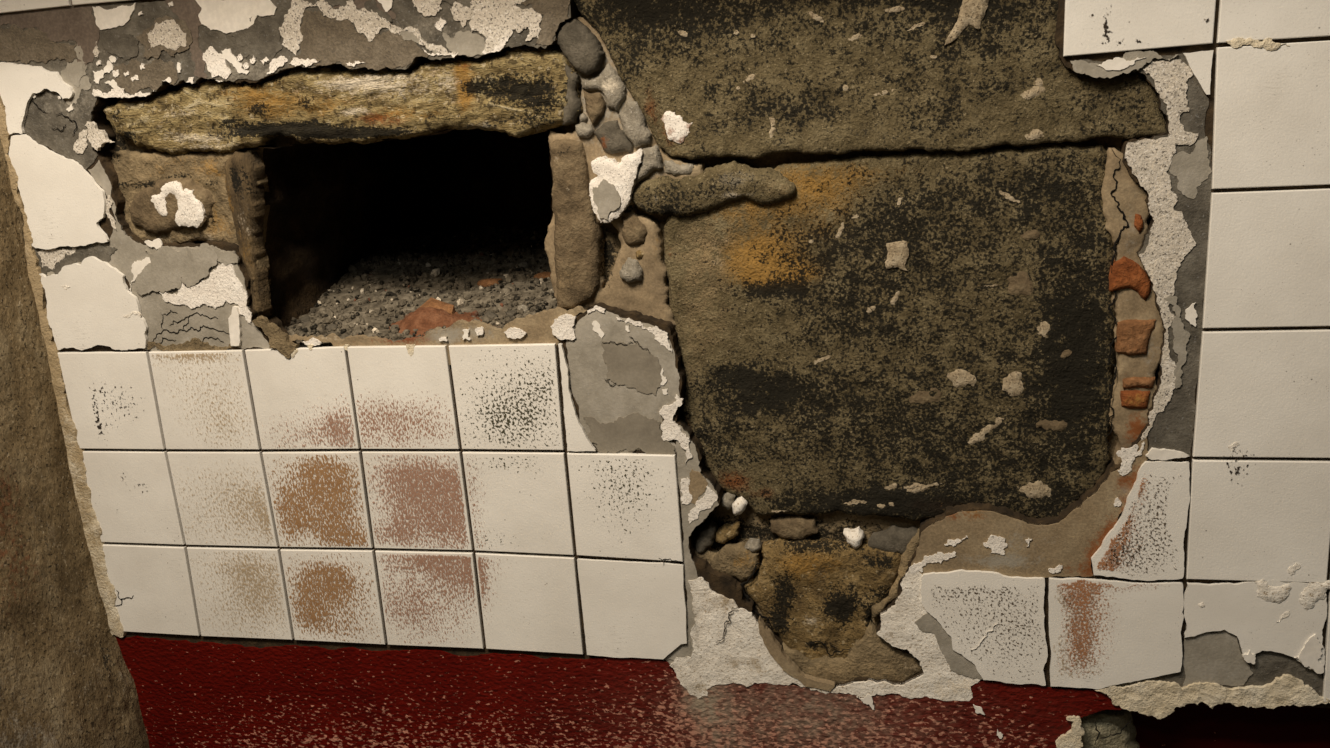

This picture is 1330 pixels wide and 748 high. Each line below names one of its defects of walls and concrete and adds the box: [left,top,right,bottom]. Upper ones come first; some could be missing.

spalling [0,0,572,358]
crack [152,267,229,343]
spalling [550,50,1330,748]
corrosion [268,454,502,644]
corrosion [1057,580,1156,674]